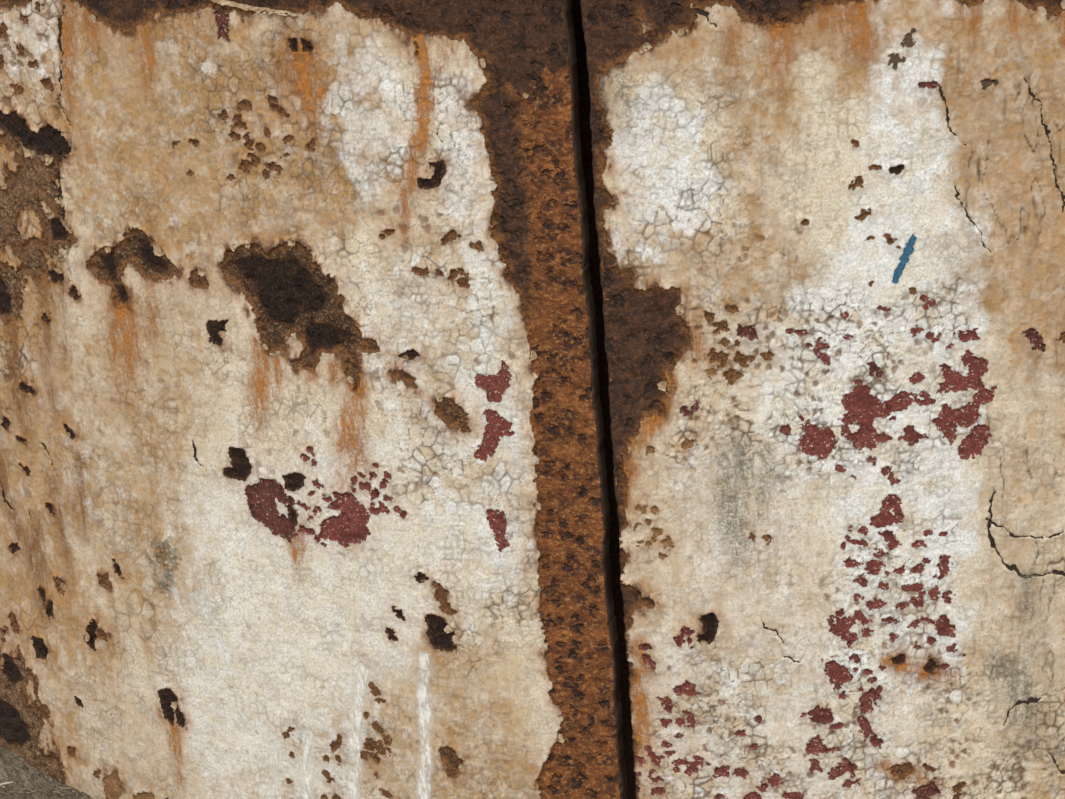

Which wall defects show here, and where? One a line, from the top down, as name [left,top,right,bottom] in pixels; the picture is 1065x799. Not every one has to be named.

rust [958,0,984,29]
rust [1007,0,1065,47]
crack [938,84,966,146]
crack [1024,77,1065,212]
peeling [0,111,81,324]
crack [954,185,992,253]
peeling [219,240,379,392]
rust [582,0,878,631]
rust [59,0,621,799]
peeling [223,446,407,548]
peeling [779,324,997,749]
crack [986,489,1065,579]